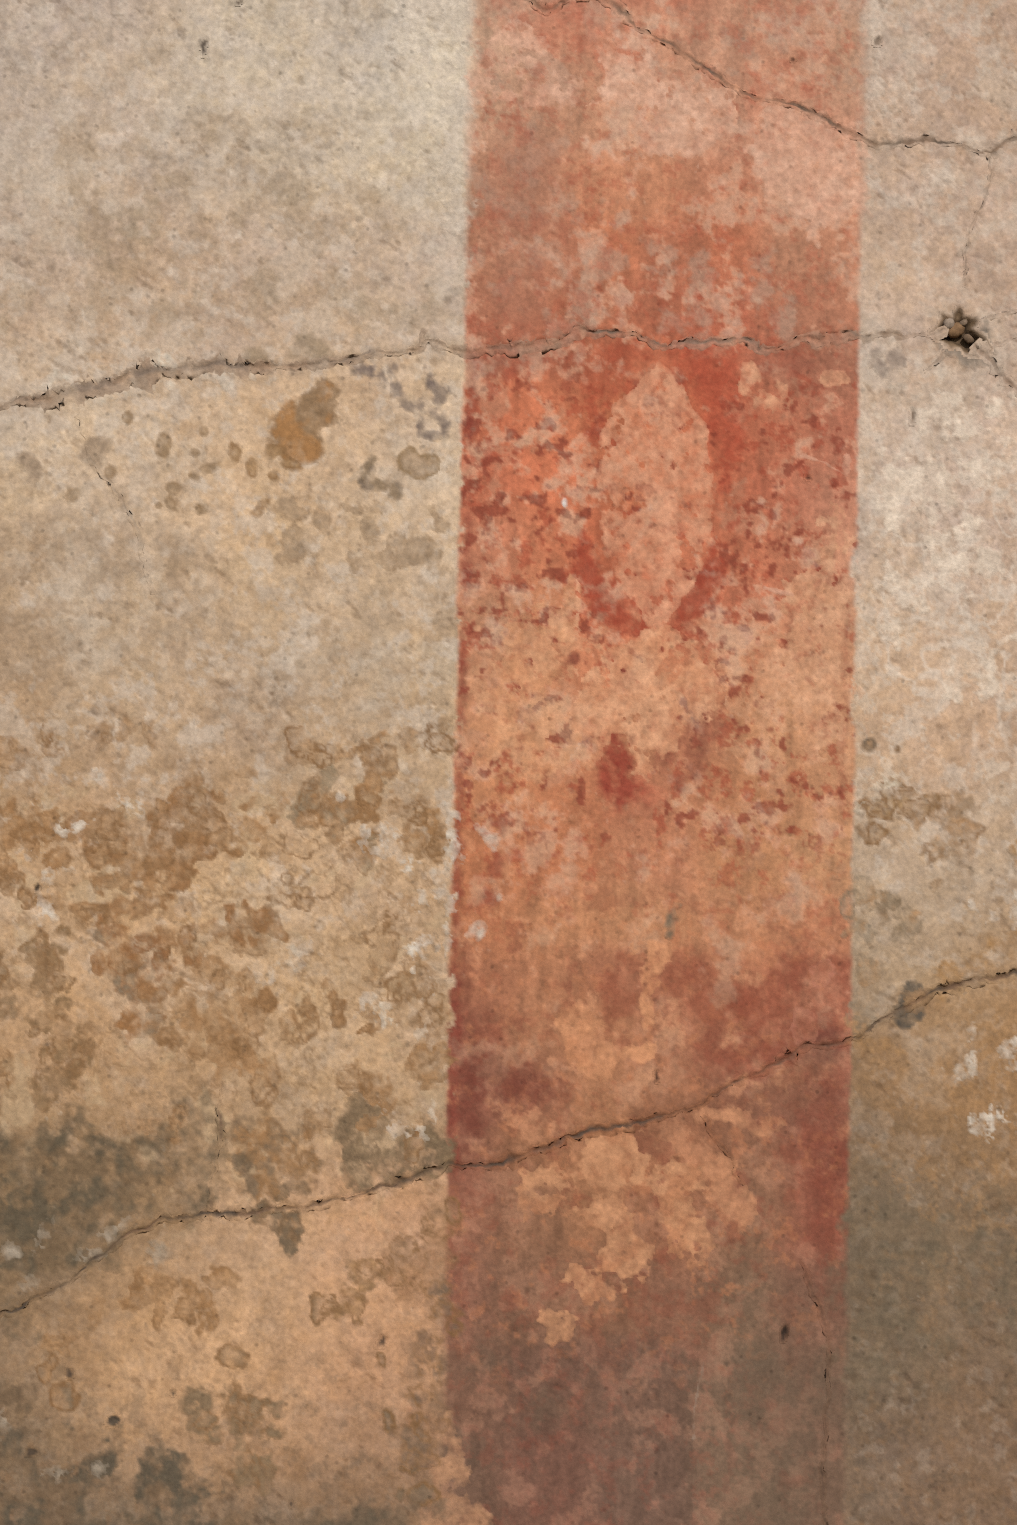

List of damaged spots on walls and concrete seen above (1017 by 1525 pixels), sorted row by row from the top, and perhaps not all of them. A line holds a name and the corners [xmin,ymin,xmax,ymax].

water stain [0,424,223,695]
water stain [72,97,254,286]
water stain [13,266,456,577]
water stain [226,162,366,259]
crack [0,0,1017,595]
water stain [0,711,501,1525]
crack [0,966,1017,1318]
water stain [817,1117,1017,1442]
water stain [967,1103,1017,1144]